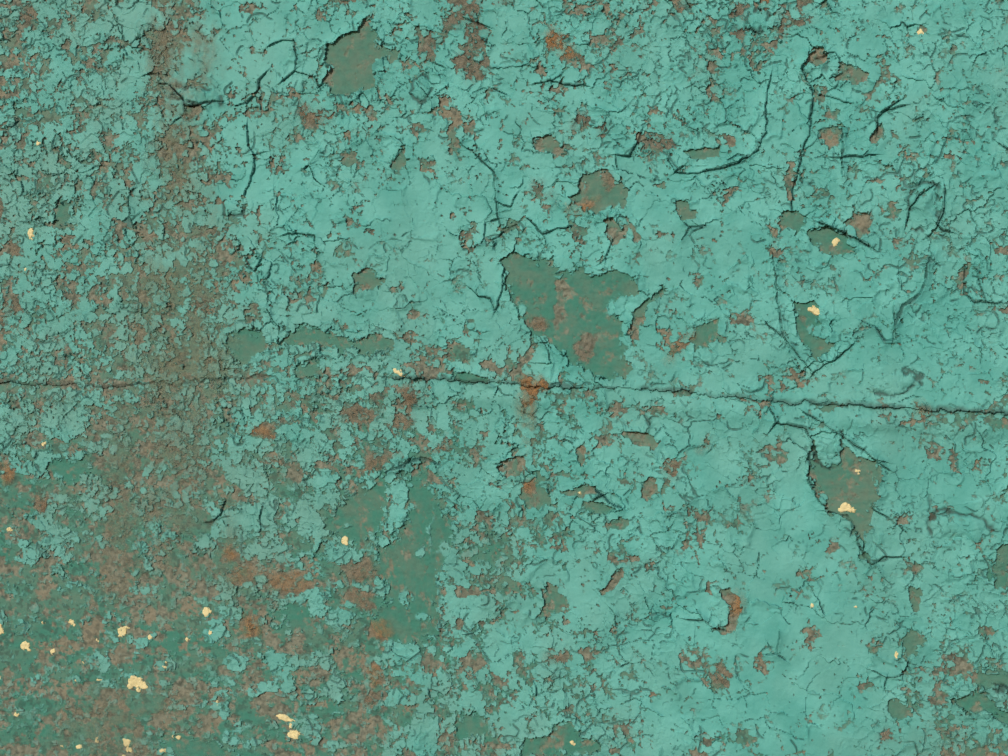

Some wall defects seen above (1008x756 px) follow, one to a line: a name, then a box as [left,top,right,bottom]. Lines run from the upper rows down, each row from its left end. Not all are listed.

crack [143,38,328,197]
peeling [316,14,401,106]
crack [459,141,572,245]
peeling [499,125,675,389]
crack [615,75,772,176]
crack [789,51,906,211]
crack [764,185,951,376]
peeling [319,463,462,659]
crack [0,372,1008,566]
peeling [799,427,889,569]
peeling [127,676,148,692]
peeling [276,714,300,739]